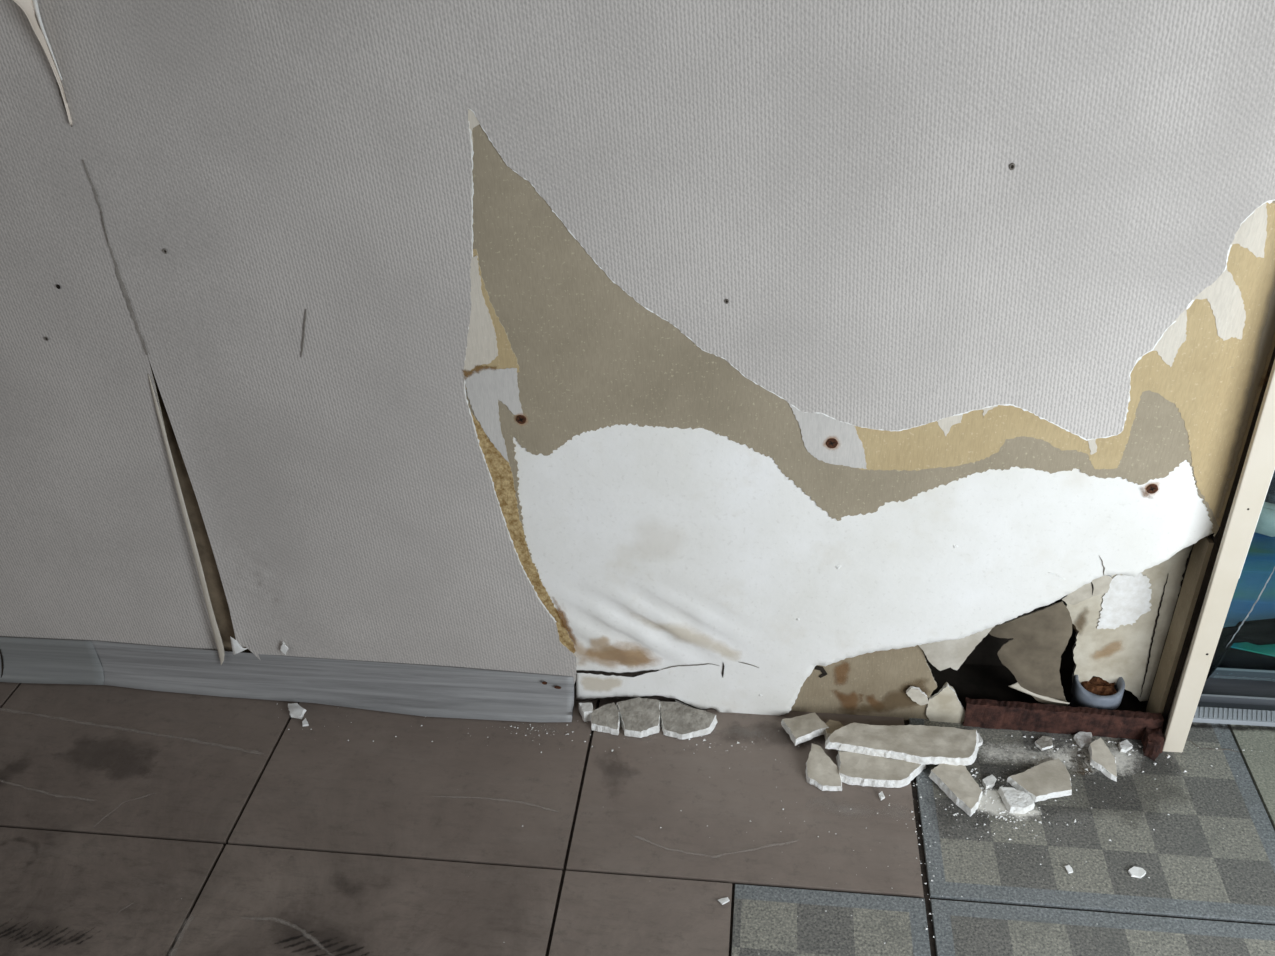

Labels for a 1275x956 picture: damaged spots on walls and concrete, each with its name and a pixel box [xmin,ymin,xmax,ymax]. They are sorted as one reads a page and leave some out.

peeling [13,0,73,125]
crack [56,82,73,127]
crack [82,160,149,355]
flaking render [463,108,1275,716]
crack [576,662,759,710]